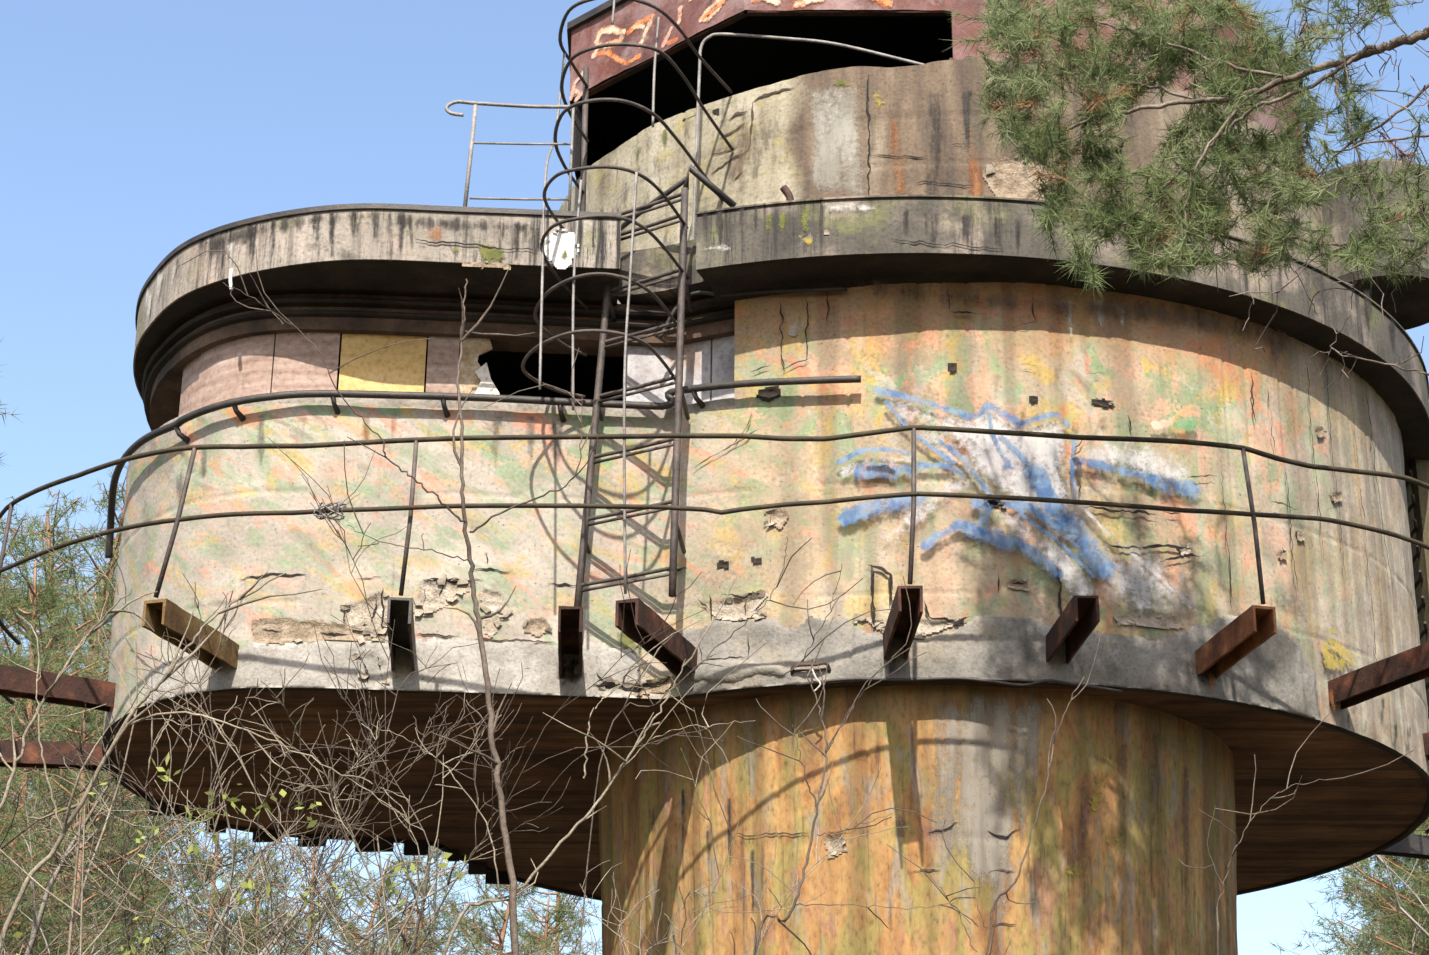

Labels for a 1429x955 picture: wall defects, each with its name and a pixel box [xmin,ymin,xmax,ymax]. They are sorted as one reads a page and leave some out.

crack [711,88,793,180]
leakage [811,91,868,210]
leakage [929,102,940,195]
leakage [963,90,972,137]
spalling [983,154,1051,201]
leakage [201,210,540,259]
spalling [251,590,397,684]
spalling [412,573,552,637]
spalling [699,589,768,621]
spalling [853,601,886,633]
spalling [903,616,964,639]